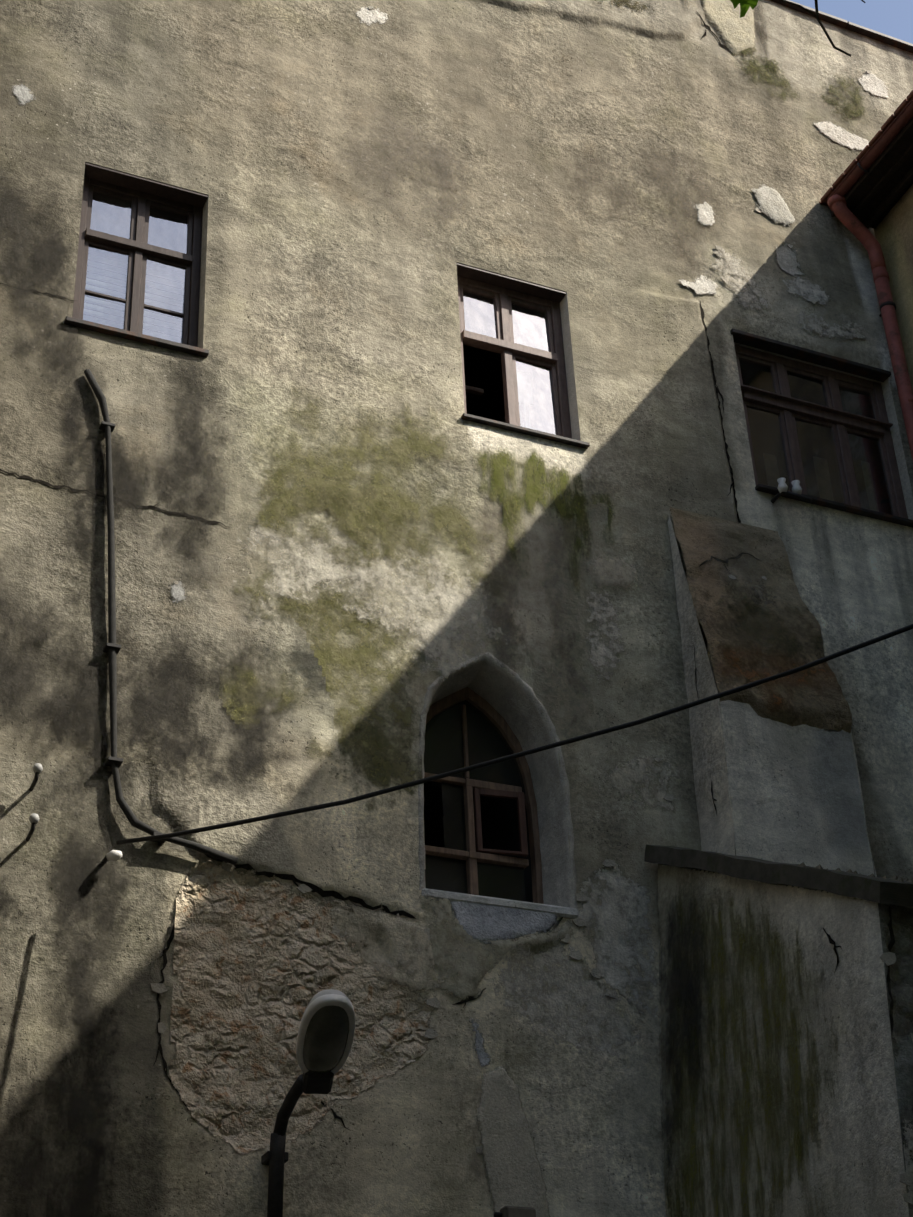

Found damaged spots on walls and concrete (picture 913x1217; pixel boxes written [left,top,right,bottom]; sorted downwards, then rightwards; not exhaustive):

peeling [356,6,388,26]
leakage [755,3,767,53]
peeling [696,202,716,226]
peeling [679,245,768,310]
peeling [776,242,866,341]
crack [700,301,741,523]
leakage [253,493,522,676]
crack [699,552,762,575]
crack [205,854,416,919]
peeling [572,858,661,1018]
spalling [150,860,441,1155]